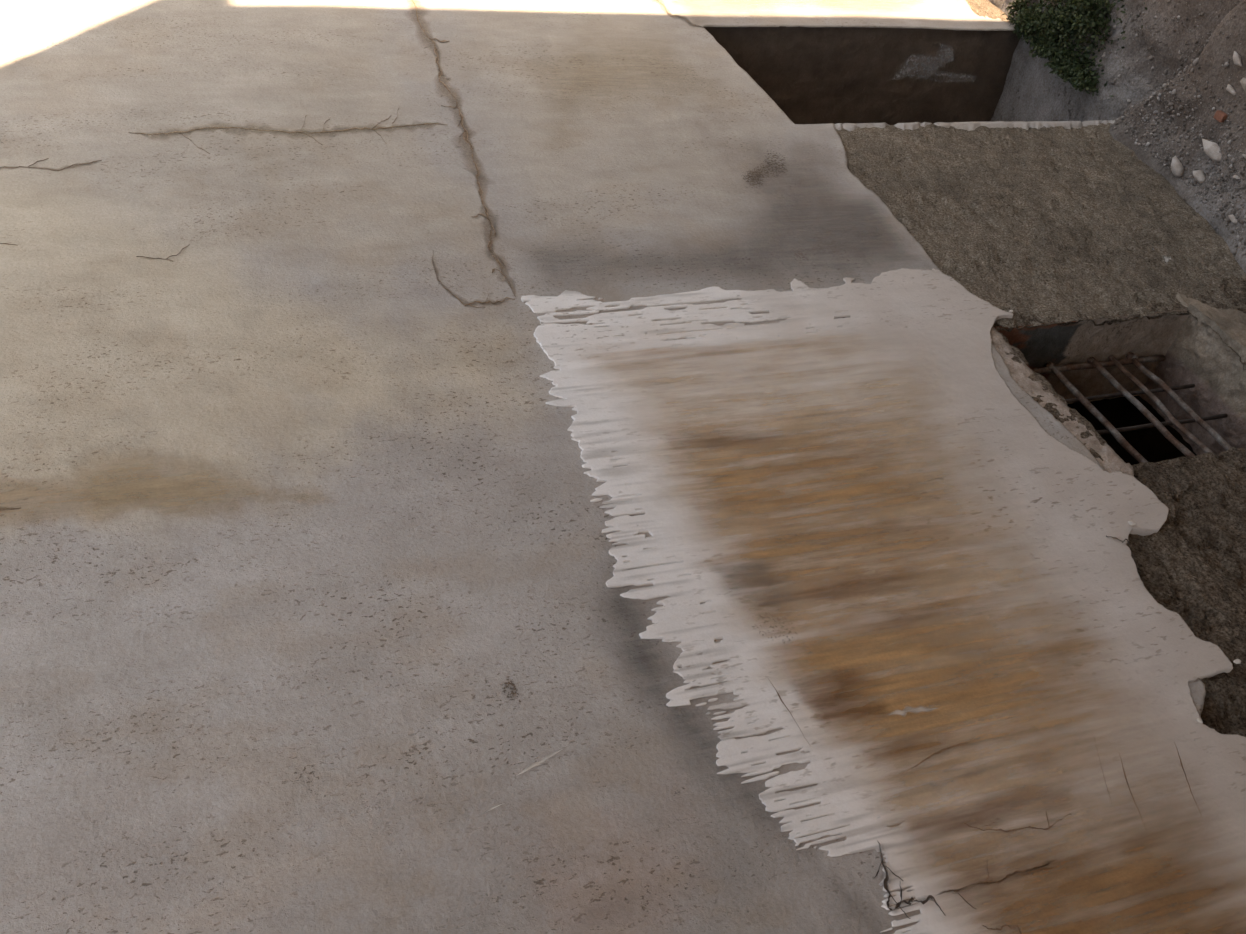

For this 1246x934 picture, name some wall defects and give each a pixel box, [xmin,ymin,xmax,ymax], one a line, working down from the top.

crack [0,158,102,171]
crack [128,0,515,308]
peeling [521,123,1246,934]